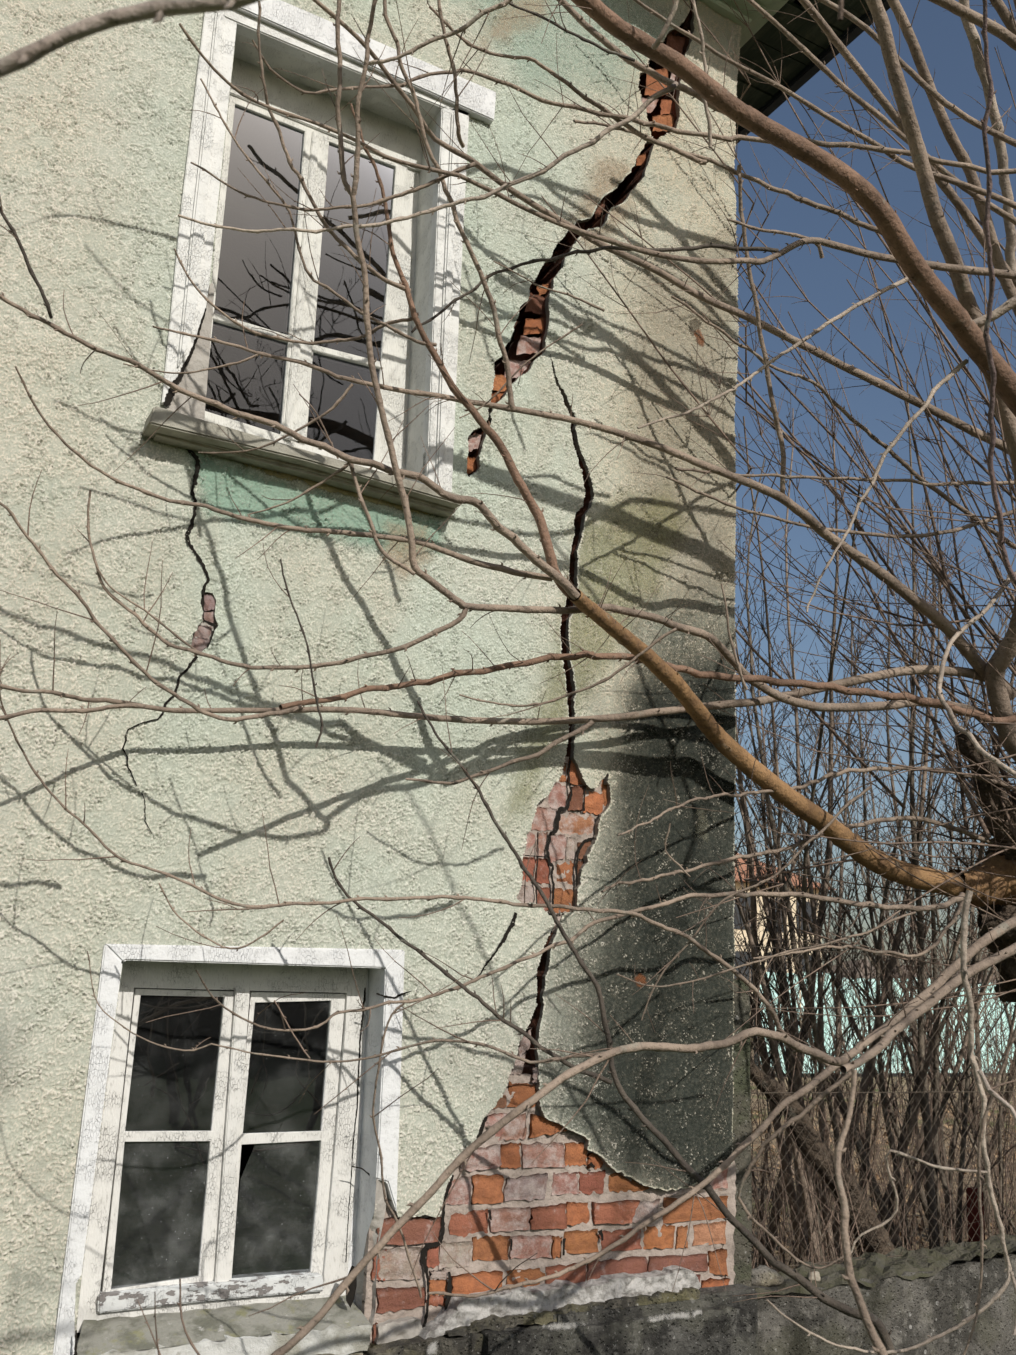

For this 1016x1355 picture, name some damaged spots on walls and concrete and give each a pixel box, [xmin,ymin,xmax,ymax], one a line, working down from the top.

crack [467,1,693,476]
crack [185,449,210,595]
crack [560,398,591,764]
crack [122,656,198,834]
water stain [654,610,736,741]
flaking render [517,756,608,914]
crack [477,912,517,977]
crack [510,914,562,1086]
water stain [557,670,736,1188]
flaking render [346,1074,736,1344]